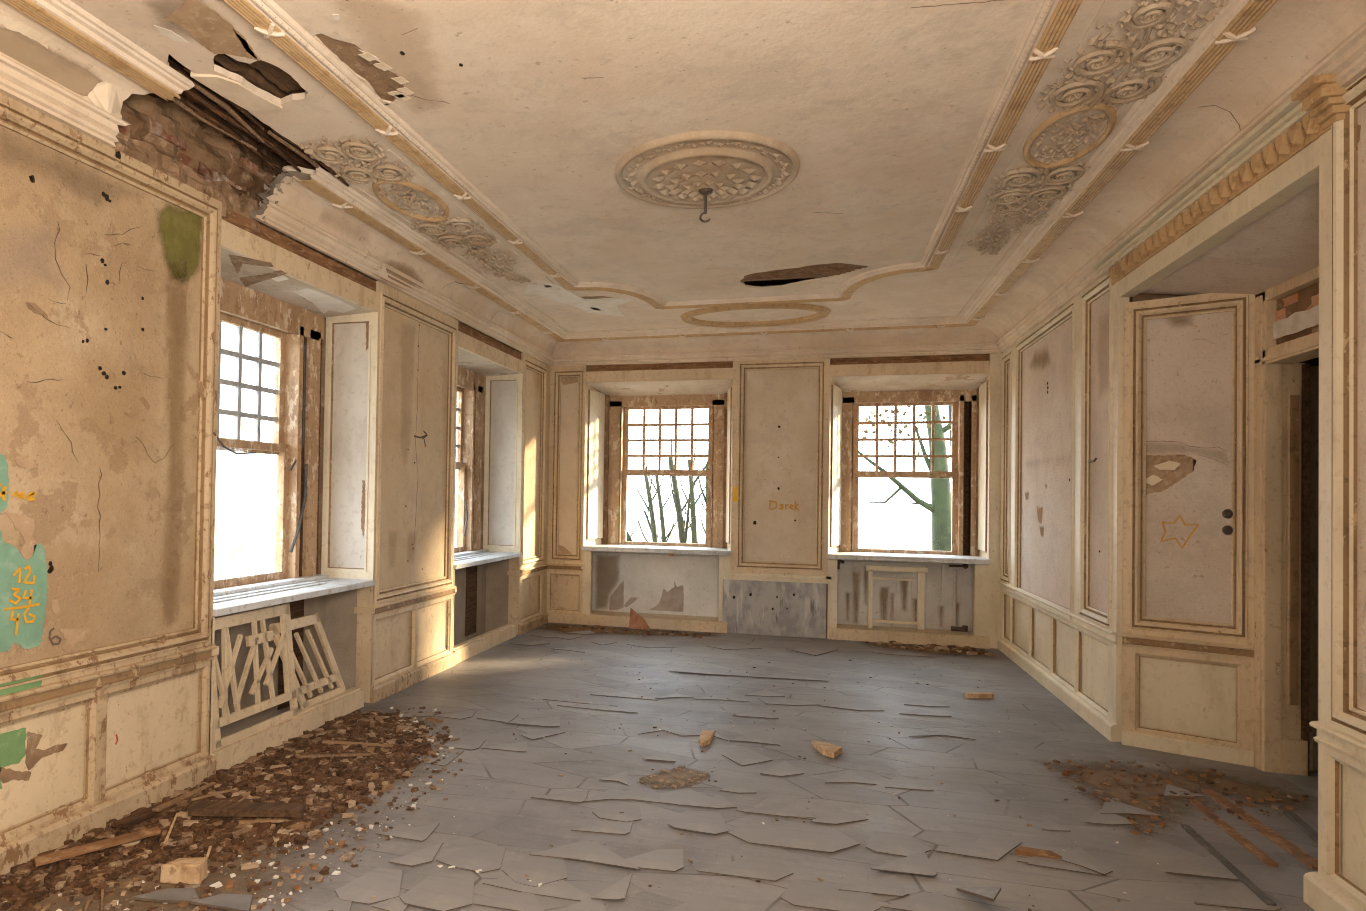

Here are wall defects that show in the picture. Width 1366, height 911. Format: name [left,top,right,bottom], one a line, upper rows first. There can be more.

peeling [154,0,260,61]
peeling [316,34,414,109]
spalling [83,81,260,232]
peeling [740,263,867,282]
peeling [0,731,68,783]